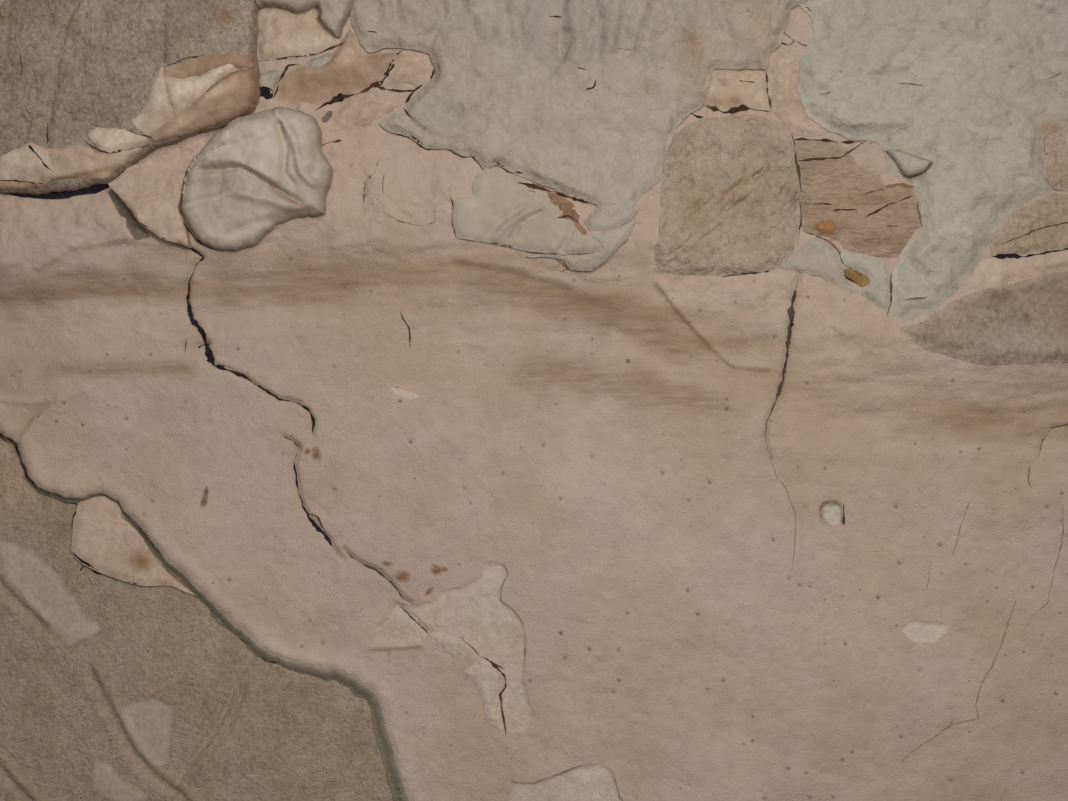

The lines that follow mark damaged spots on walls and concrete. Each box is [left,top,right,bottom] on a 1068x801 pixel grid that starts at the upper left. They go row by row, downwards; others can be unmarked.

spalling [109,189,150,240]
spalling [547,192,587,235]
crack [723,270,768,278]
spalling [885,149,933,178]
crack [141,213,430,636]
crack [765,276,799,557]
spalling [0,438,393,801]
flaking render [375,561,535,733]
crack [904,507,1064,759]
flaking render [508,763,623,801]